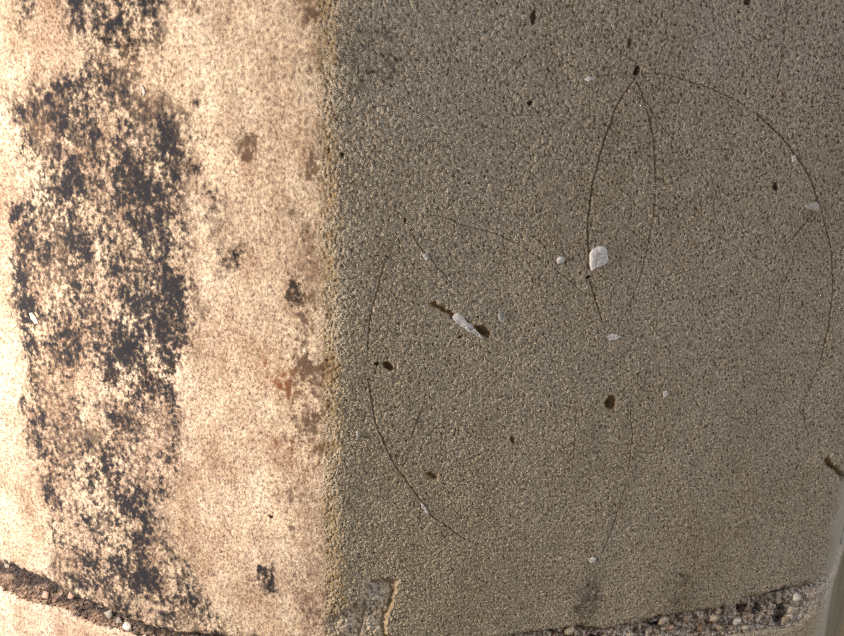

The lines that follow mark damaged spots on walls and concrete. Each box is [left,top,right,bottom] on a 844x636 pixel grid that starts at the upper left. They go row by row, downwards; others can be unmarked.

water stain [299,0,322,32]
water stain [231,128,259,162]
water stain [298,118,325,189]
water stain [216,247,242,279]
water stain [1,0,231,636]
water stain [284,265,330,471]
water stain [256,563,278,595]
water stain [293,575,389,636]
spalling [325,577,396,636]